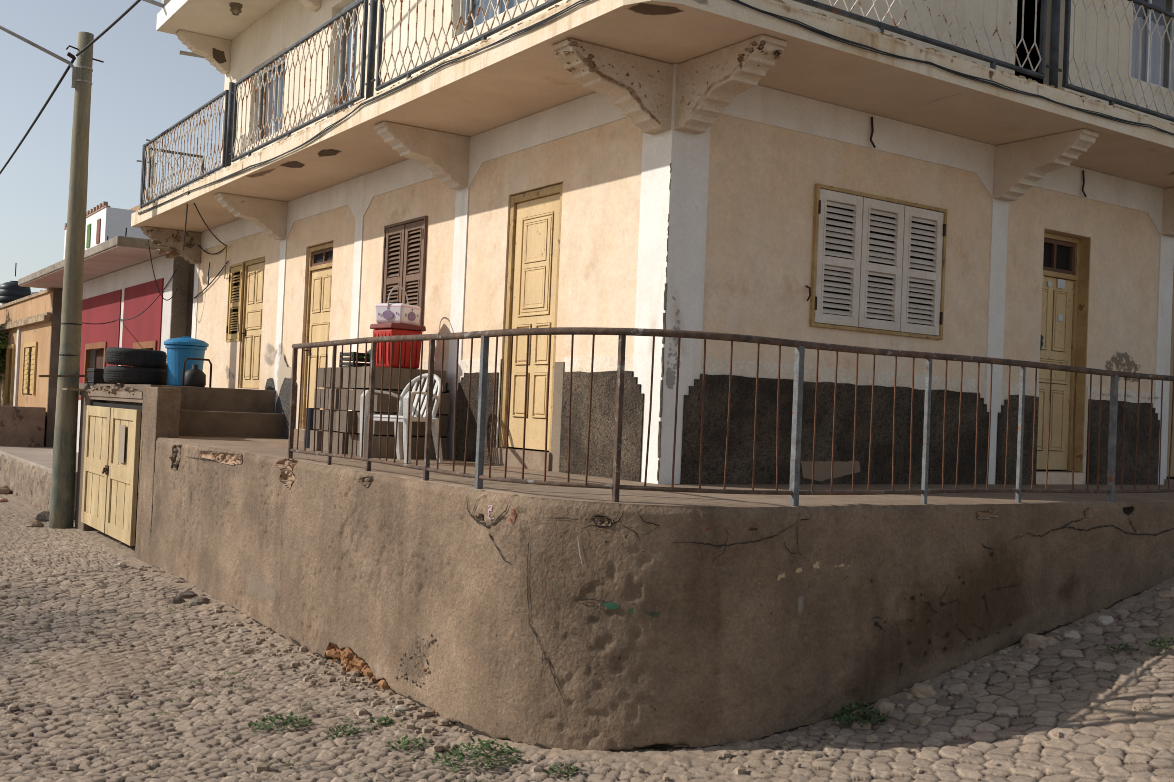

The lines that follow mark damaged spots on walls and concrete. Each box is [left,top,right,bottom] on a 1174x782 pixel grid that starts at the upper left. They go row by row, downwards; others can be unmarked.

crack [657,163,672,481]
flaking render [199,451,243,465]
flaking render [275,458,298,490]
crack [981,518,1174,550]
crack [152,565,344,666]
crack [466,495,812,704]
crack [1098,589,1148,613]
flaking render [324,634,438,695]
crack [701,584,1072,748]
crack [399,694,427,707]
crack [452,718,571,750]